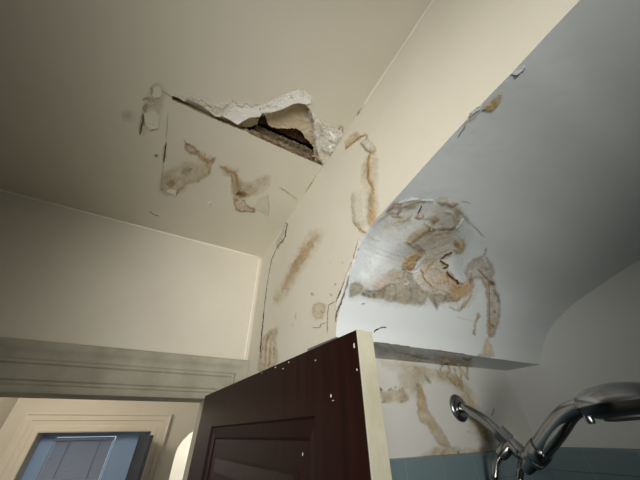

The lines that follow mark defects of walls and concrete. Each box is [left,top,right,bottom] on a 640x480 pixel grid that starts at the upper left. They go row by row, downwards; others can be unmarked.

peeling [469,94,501,117]
flaking render [311,117,346,164]
crack [260,223,288,352]
damp [285,237,316,286]
crack [313,222,378,331]
damp [415,383,448,456]
damp [470,416,489,440]